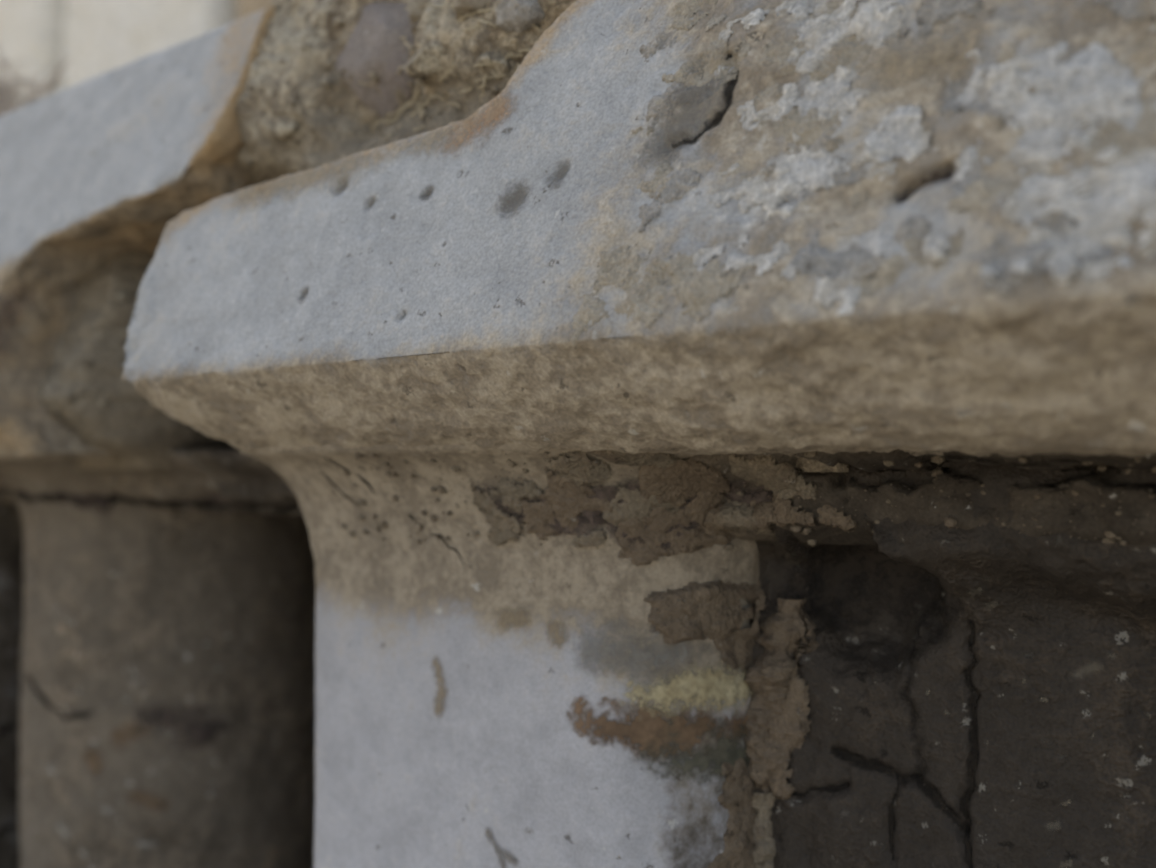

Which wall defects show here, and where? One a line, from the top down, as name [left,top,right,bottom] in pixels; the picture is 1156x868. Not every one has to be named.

peeling [630,0,890,233]
leakage [709,0,1156,283]
peeling [939,72,1042,133]
peeling [1079,94,1156,162]
peeling [568,245,754,349]
leakage [693,232,796,281]
leakage [812,276,861,315]
peeling [788,158,1115,302]
spalling [470,450,856,566]
corrosion [568,668,753,782]
peeling [643,579,820,868]
crack [791,622,980,868]